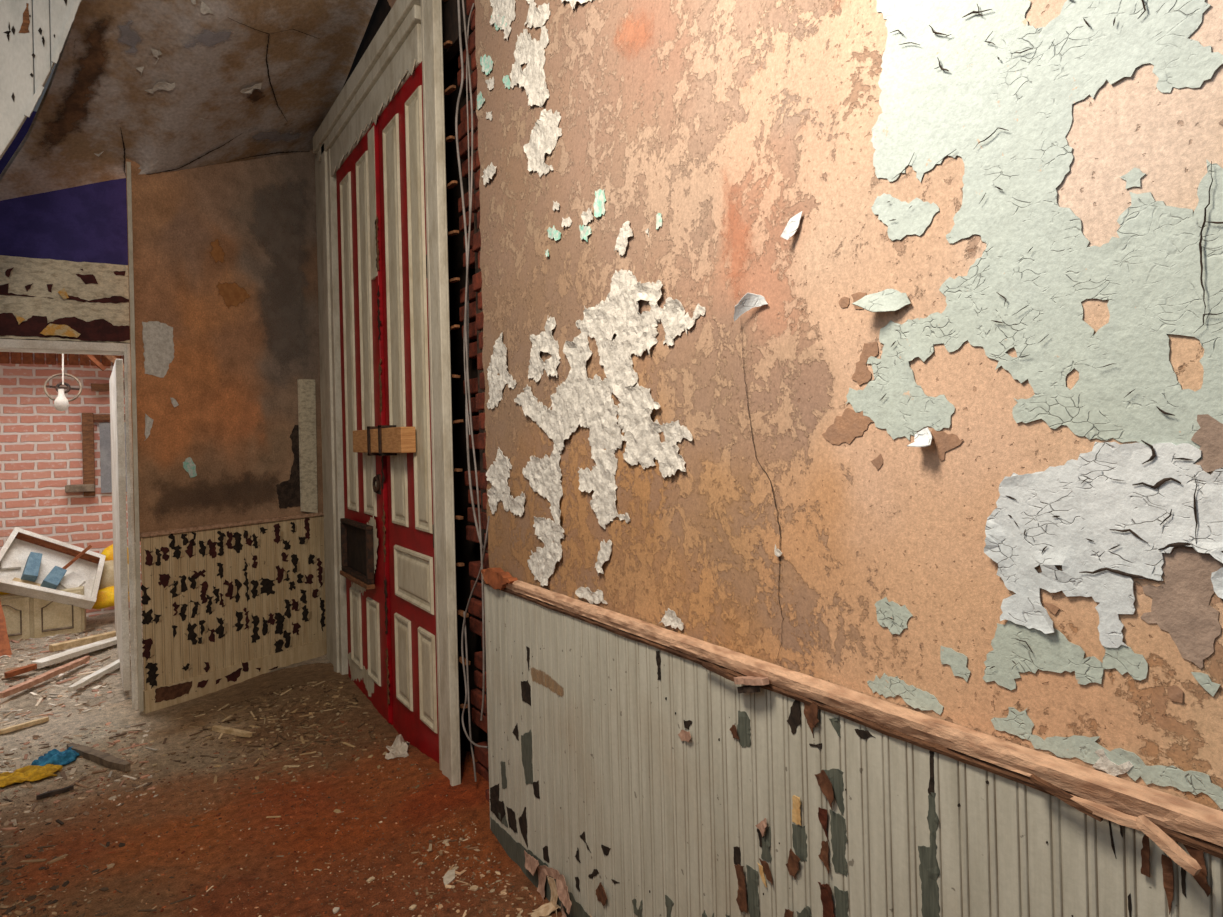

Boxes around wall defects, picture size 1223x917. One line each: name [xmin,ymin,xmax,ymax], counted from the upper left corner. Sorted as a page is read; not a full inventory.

peeling [490,0,592,177]
crack [890,4,1054,71]
crack [1083,0,1146,27]
crack [888,128,1009,221]
crack [1193,161,1223,334]
peeling [0,313,174,378]
peeling [444,51,706,752]
peeling [822,0,1223,669]
crack [1124,389,1175,416]
peeling [135,425,326,703]
crack [1007,440,1223,582]
peeling [702,768,849,917]